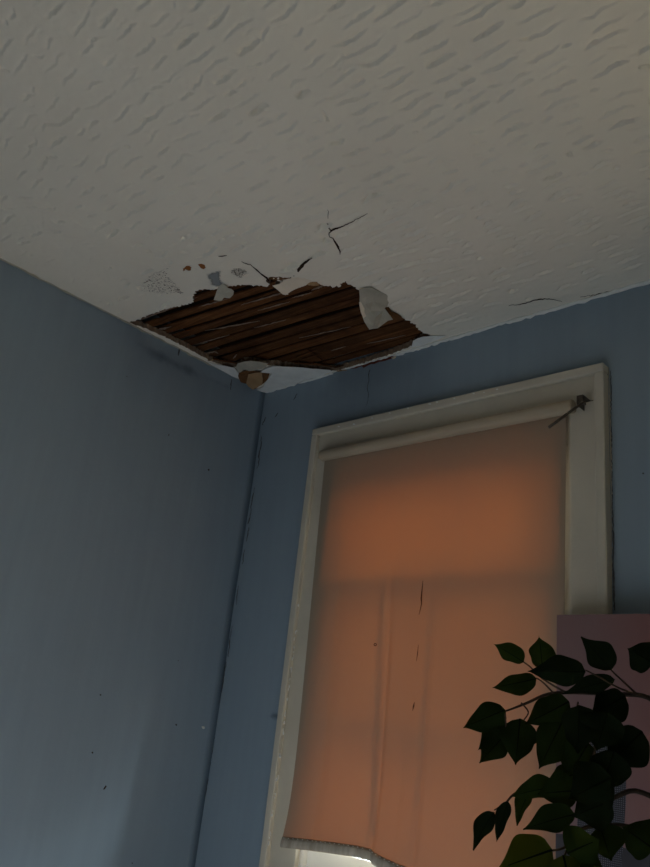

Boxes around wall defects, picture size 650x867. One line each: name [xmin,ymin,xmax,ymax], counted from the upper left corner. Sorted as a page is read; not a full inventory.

crack [327,211,368,253]
peeling [214,284,234,301]
crack [218,255,312,281]
peeling [273,277,319,295]
peeling [359,287,403,330]
peeling [209,354,396,393]